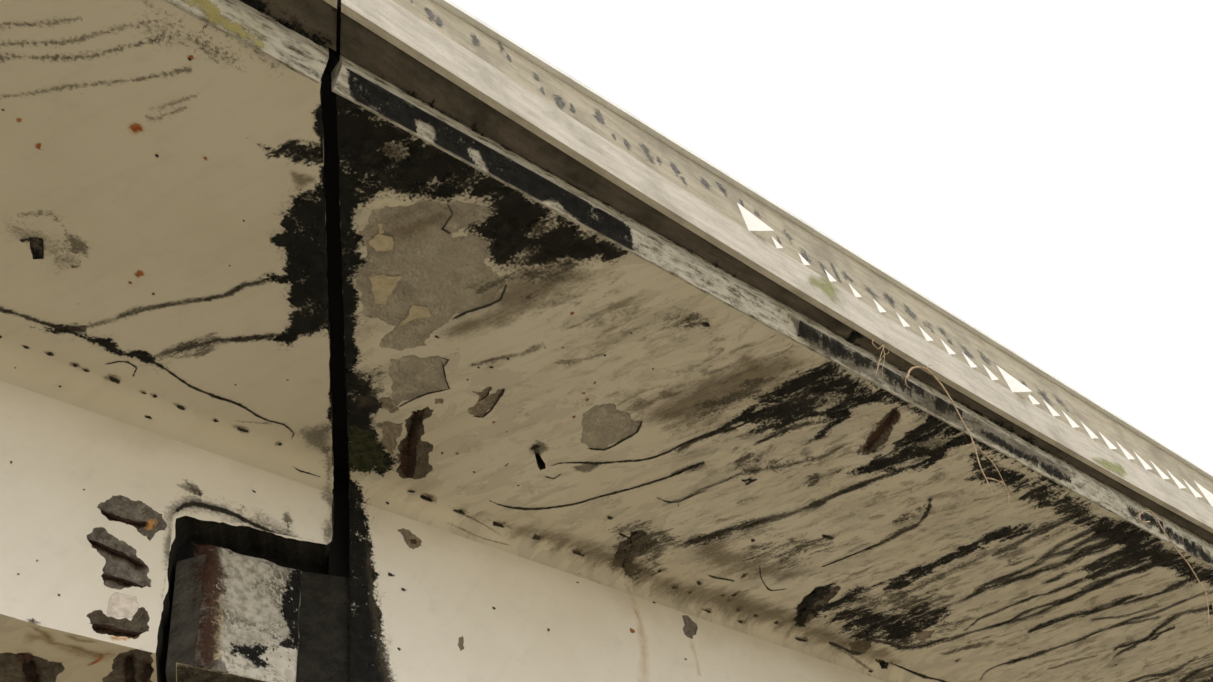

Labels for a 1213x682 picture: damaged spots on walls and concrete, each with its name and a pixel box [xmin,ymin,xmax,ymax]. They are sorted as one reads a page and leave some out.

spalling [0,652,65,682]
spalling [86,495,167,682]
corrosion [193,545,228,669]
damp [0,68,635,682]
peeling [356,200,507,480]
crack [458,438,704,524]
peeling [581,403,642,451]
damp [667,314,1213,682]